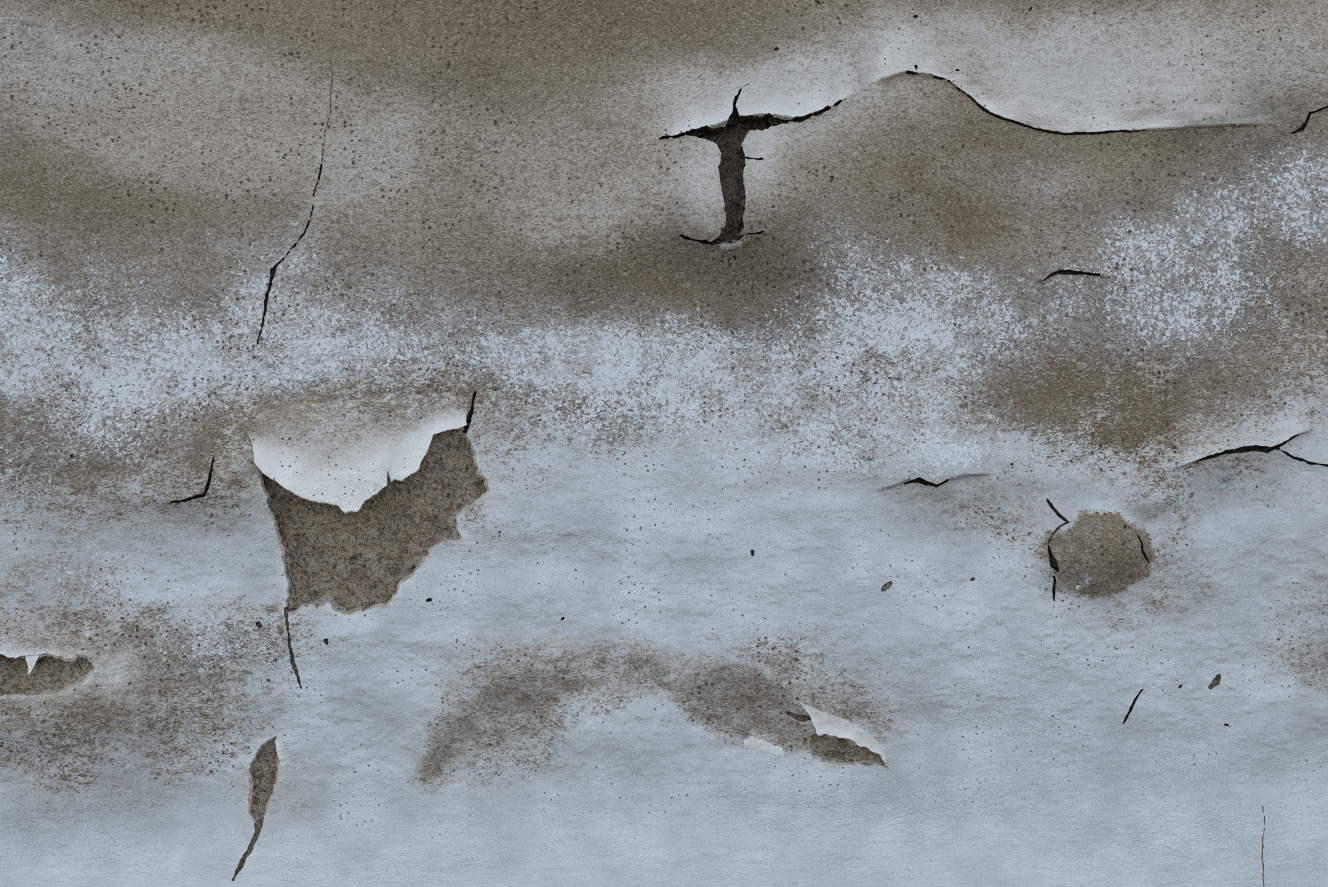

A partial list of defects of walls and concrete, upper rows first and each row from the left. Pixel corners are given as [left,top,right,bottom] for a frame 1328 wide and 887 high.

crack [1291,106,1328,134]
crack [257,60,333,345]
leakage [0,0,1328,492]
leakage [0,392,260,524]
peeling [0,150,1328,689]
crack [1196,433,1328,467]
flaking render [0,646,95,700]
peeling [415,637,889,789]
leakage [1282,642,1328,688]
spalling [232,736,290,882]